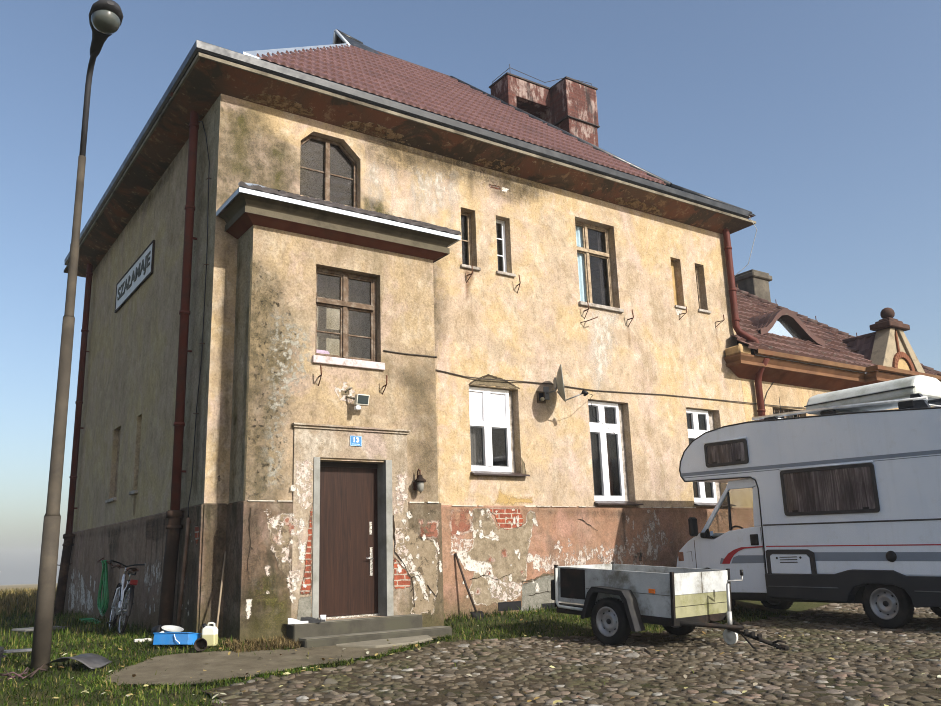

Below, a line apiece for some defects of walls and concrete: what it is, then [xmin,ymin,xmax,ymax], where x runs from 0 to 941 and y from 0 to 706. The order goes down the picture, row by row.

damp [242,262,307,500]
peeling [68,568,96,614]
flaking render [260,460,313,620]
peeling [393,473,671,615]